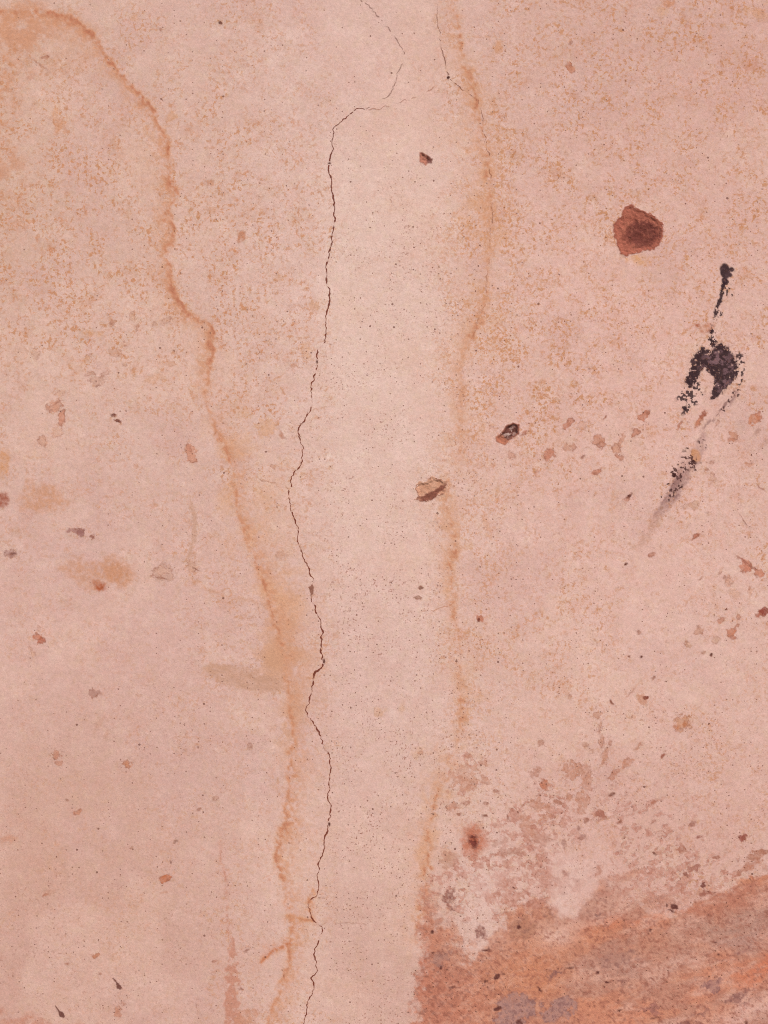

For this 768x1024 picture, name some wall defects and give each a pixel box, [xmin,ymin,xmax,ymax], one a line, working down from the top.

spalling [416,149,437,169]
damp [674,262,746,430]
damp [0,0,338,1024]
crack [256,0,494,1024]
spalling [410,471,453,505]
damp [381,0,530,971]
spalling [492,418,529,460]
peeling [534,409,651,478]